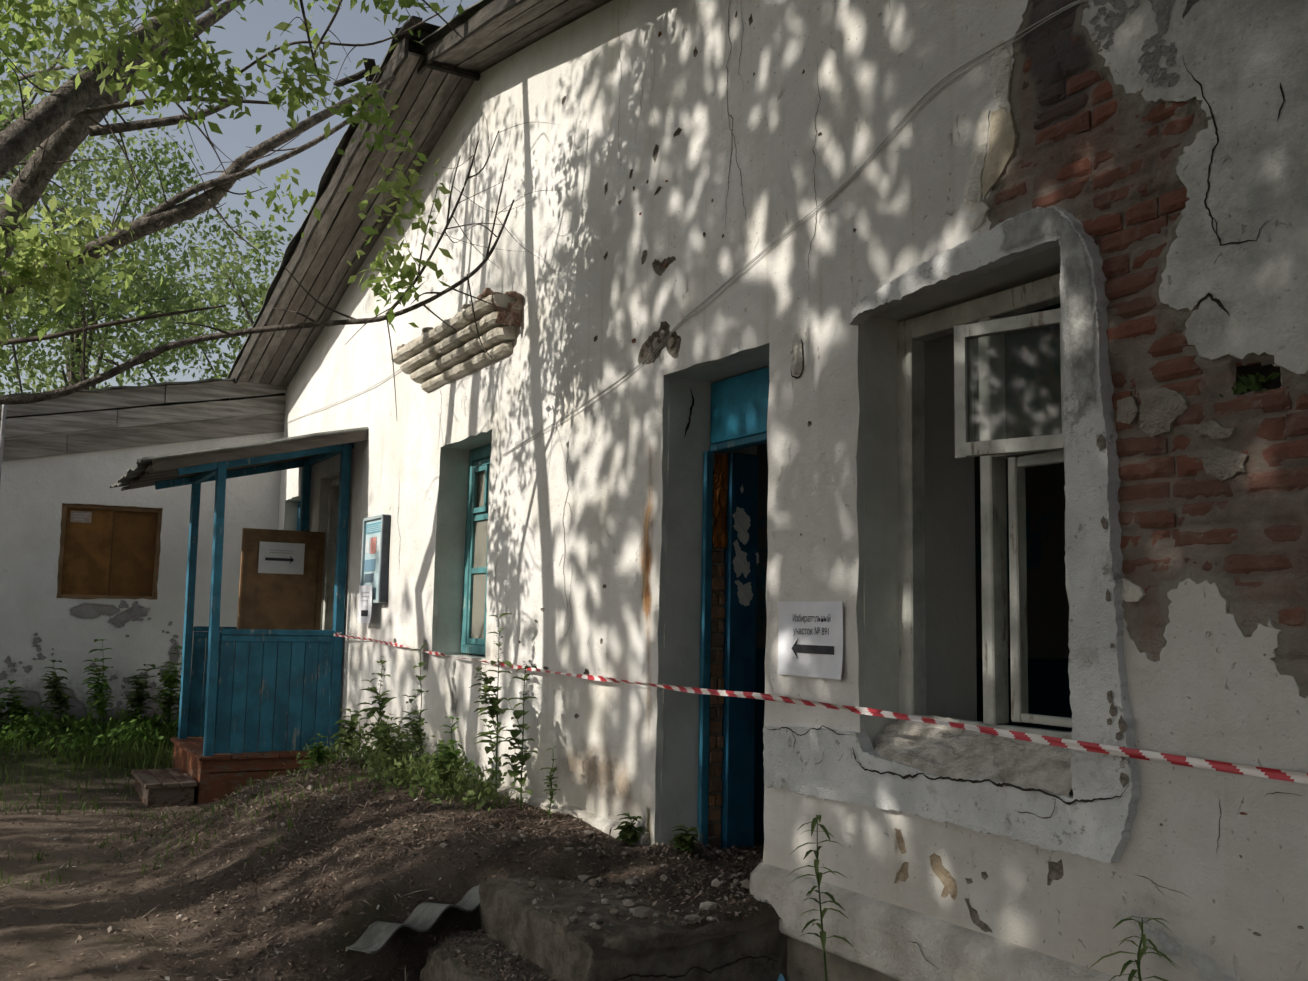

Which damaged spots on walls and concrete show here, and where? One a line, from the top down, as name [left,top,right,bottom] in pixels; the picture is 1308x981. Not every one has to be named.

crack [725,3,746,225]
crack [808,64,821,293]
crack [1183,58,1269,246]
spalling [632,321,681,364]
spalling [641,250,676,276]
spalling [962,0,1308,698]
crack [1193,292,1230,316]
corrosion [641,494,651,618]
peeling [0,600,183,727]
crack [765,725,1129,819]
peeling [1107,690,1129,788]
peeling [929,853,992,933]